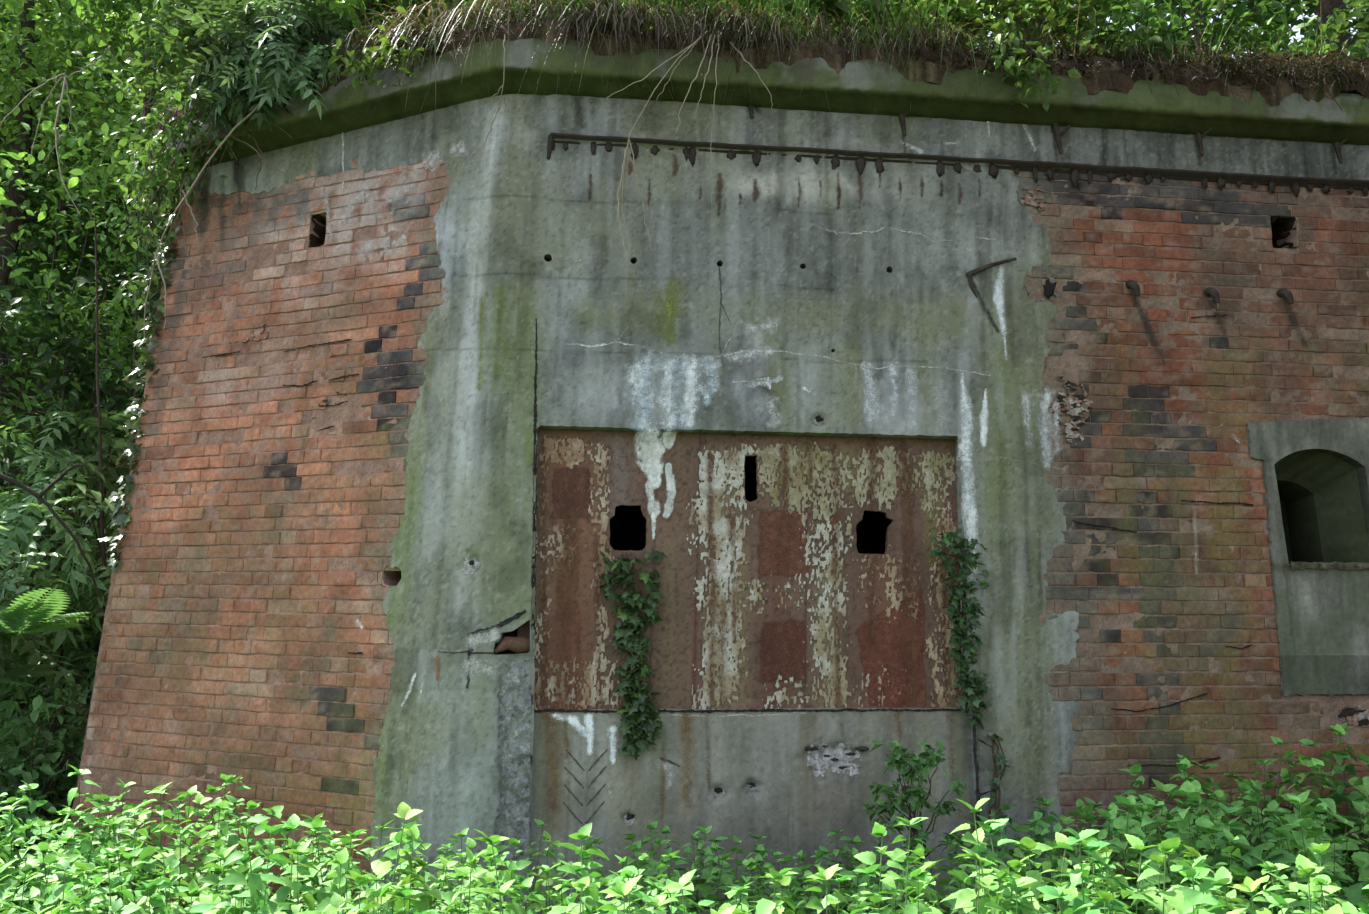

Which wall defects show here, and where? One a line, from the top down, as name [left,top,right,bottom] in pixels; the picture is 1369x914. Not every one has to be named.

efflorescence [628,349,772,539]
water stain [749,376,782,426]
rust [758,442,809,577]
efflorescence [959,373,988,578]
efflorescence [1022,389,1059,467]
spalling [1048,374,1093,445]
rust [708,453,736,707]
rust [858,438,926,723]
peeling [494,435,621,912]
rust [760,620,807,682]
spalling [805,741,869,779]
spalling [1335,705,1369,727]